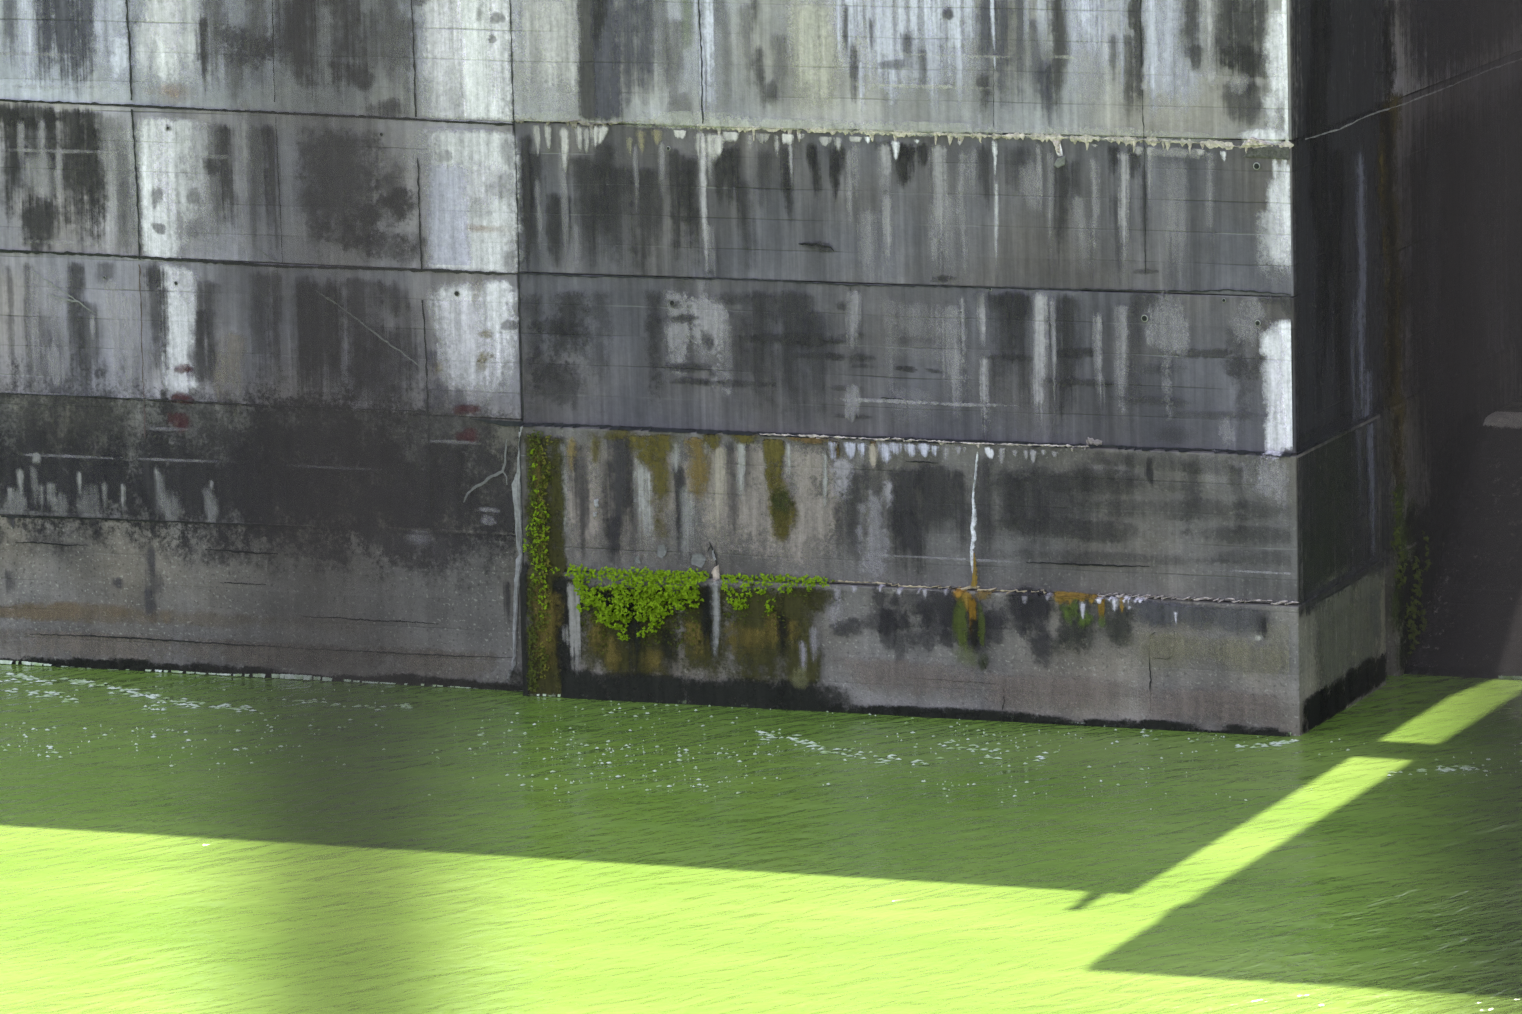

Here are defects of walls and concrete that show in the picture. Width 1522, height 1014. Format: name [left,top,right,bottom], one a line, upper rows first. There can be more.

water stain [21,0,236,87]
water stain [0,103,254,612]
water stain [401,0,1458,733]